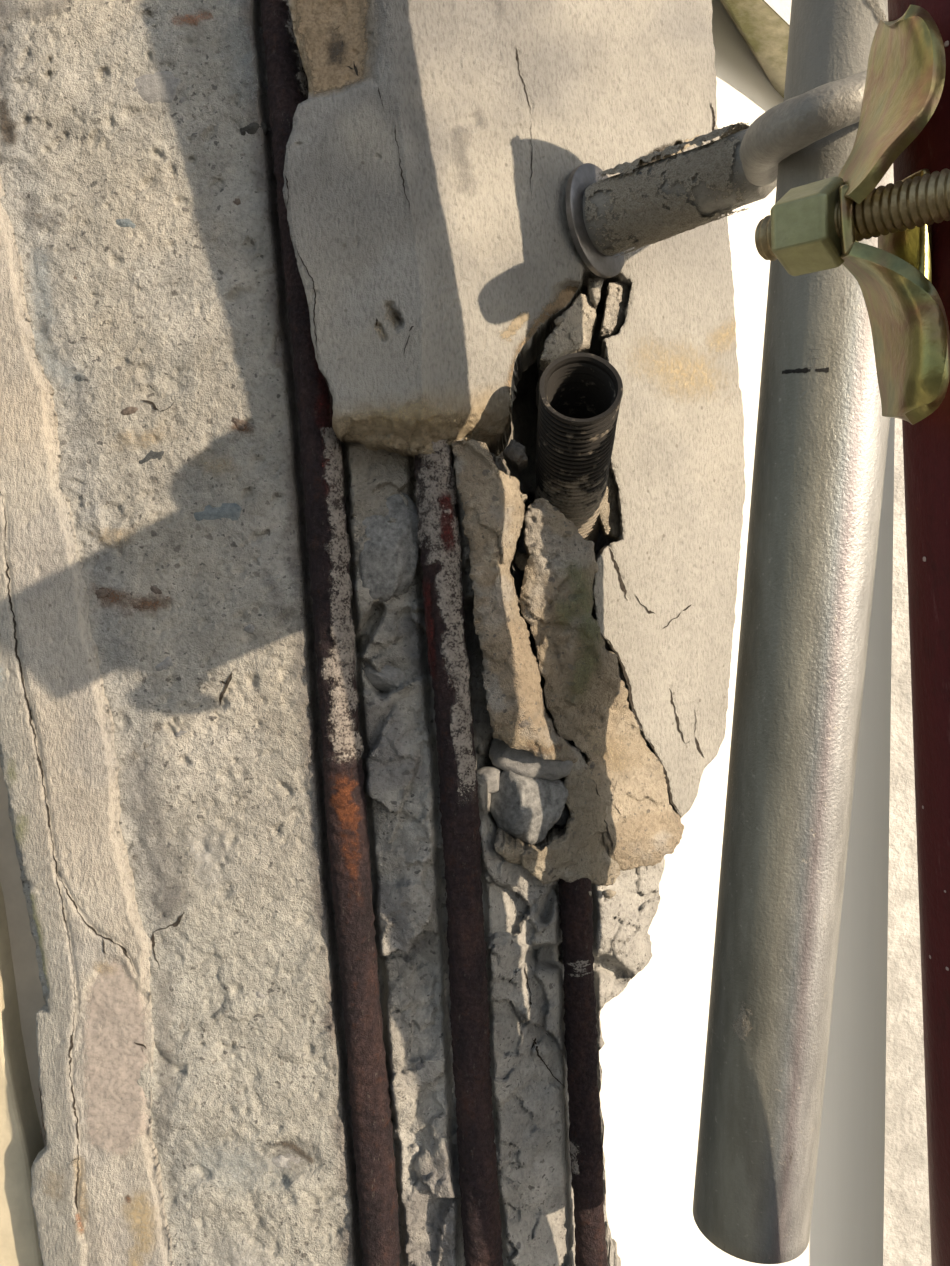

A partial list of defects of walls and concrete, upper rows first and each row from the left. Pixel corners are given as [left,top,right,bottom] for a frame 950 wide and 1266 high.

peeling [283,0,369,98]
rust [315,363,338,492]
rust [439,493,455,550]
peeling [321,400,500,799]
crack [609,548,692,629]
crack [607,639,704,814]
rust [331,780,360,822]
crack [0,492,184,1237]
peeling [567,960,591,977]